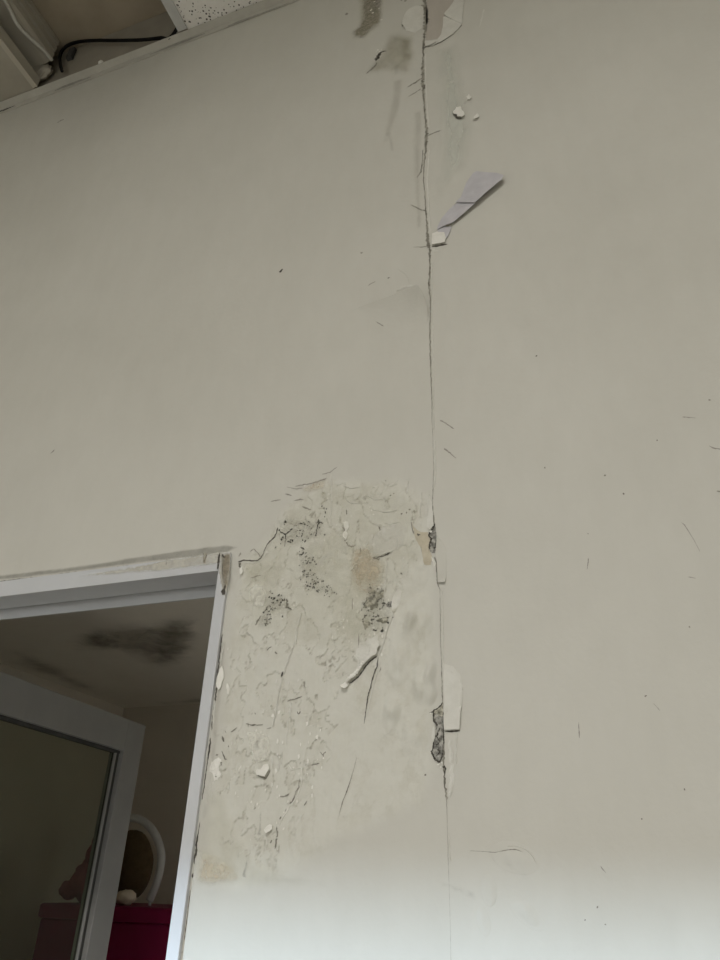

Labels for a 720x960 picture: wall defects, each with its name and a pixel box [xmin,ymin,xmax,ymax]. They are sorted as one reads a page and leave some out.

peeling [401,0,464,48]
crack [408,0,441,528]
peeling [432,232,447,253]
leakage [266,506,337,597]
spalling [344,486,446,582]
spalling [340,583,402,688]
crack [436,561,444,709]
peeling [202,567,326,848]
crack [364,660,381,723]
spalling [429,703,446,774]
crack [442,734,455,807]